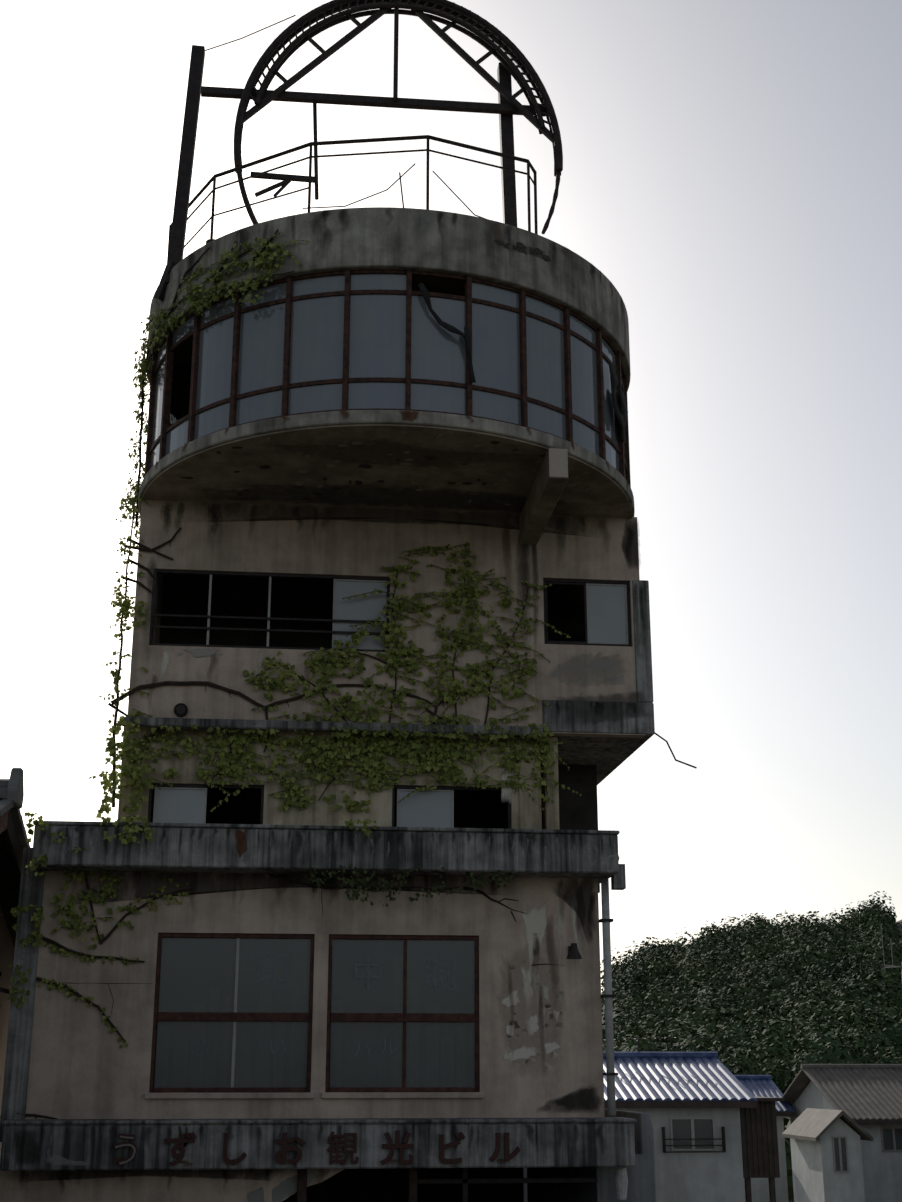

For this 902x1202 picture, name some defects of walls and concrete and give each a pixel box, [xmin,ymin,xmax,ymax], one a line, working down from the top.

leakage [622,523,640,565]
leakage [522,881,594,1033]
peeling [502,959,567,1074]